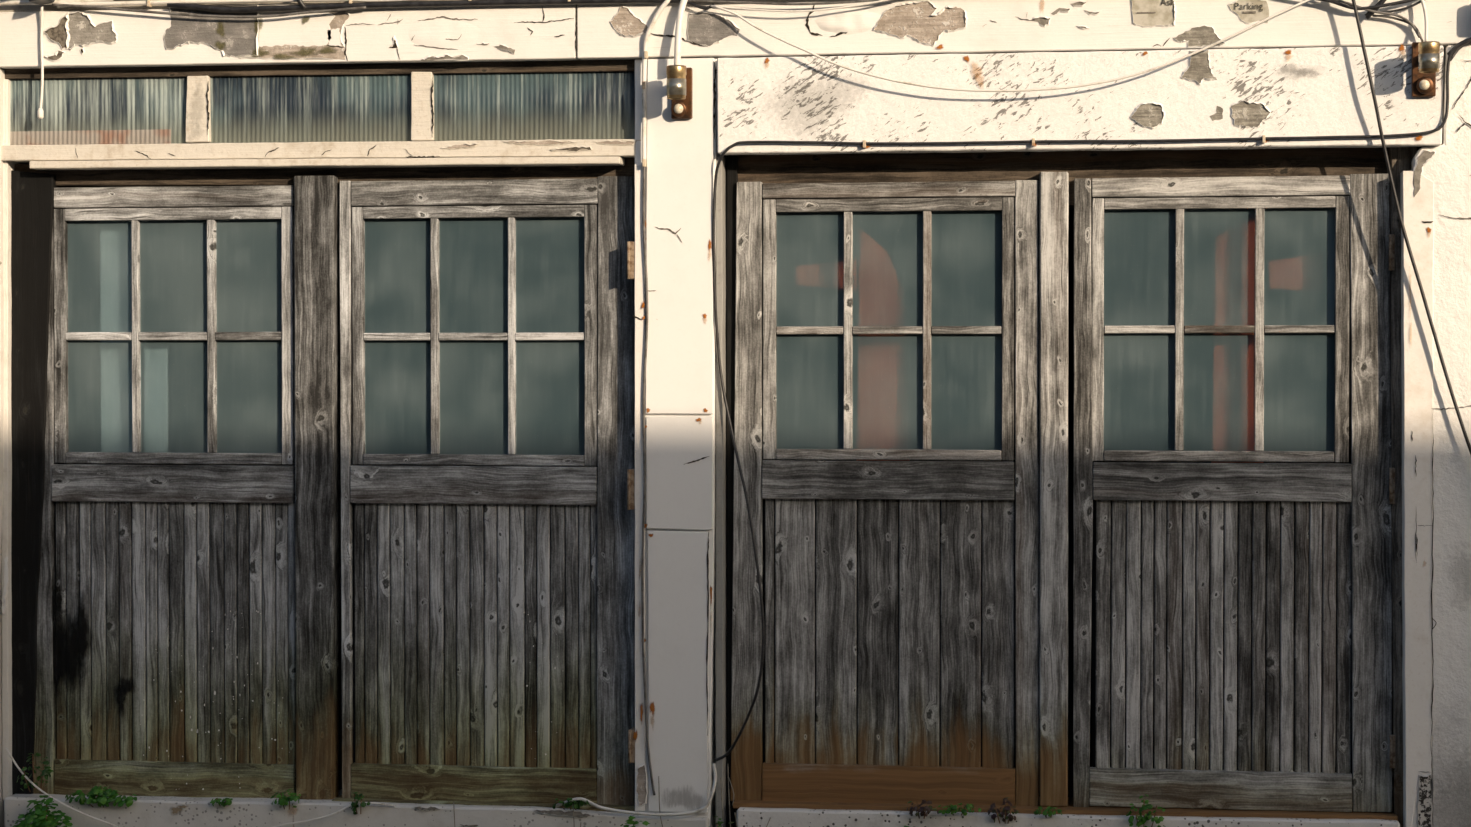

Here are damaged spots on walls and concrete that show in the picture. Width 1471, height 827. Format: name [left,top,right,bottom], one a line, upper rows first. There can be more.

peeling [43,10,118,62]
peeling [163,4,351,60]
peeling [609,4,741,46]
peeling [872,0,968,47]
peeling [1130,0,1226,85]
peeling [1129,101,1166,130]
peeling [1210,100,1272,128]
crack [1422,215,1471,223]
crack [1411,405,1471,794]
corrosion [633,702,655,741]